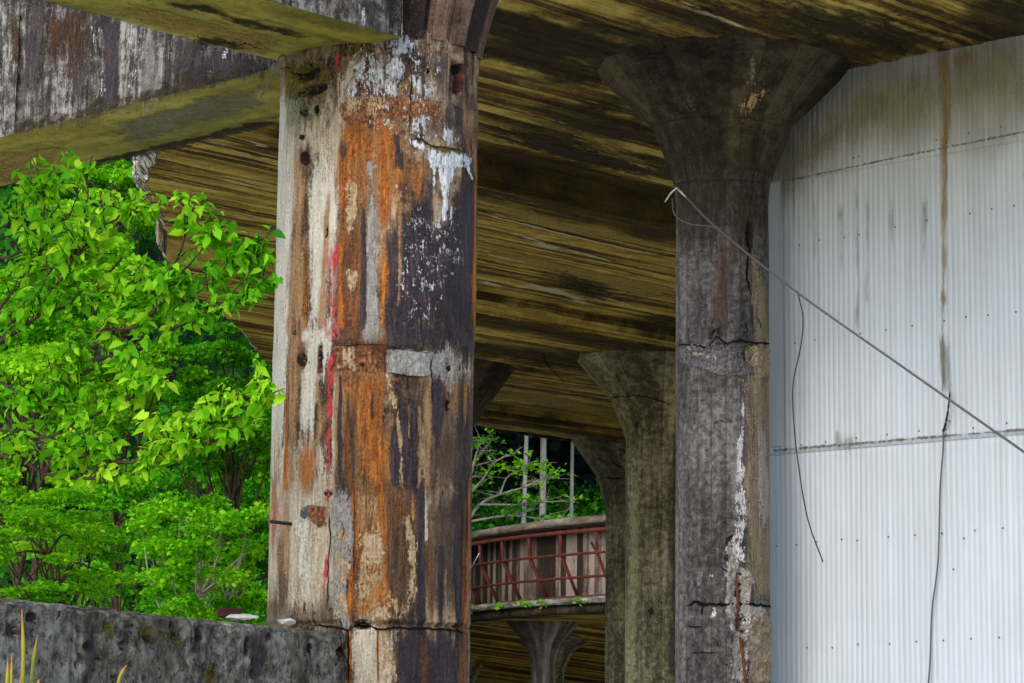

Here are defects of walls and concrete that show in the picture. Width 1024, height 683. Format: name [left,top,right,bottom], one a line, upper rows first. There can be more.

rust [272,119,433,683]
spalling [269,43,471,683]
water stain [316,0,1024,683]
crack [678,219,770,348]
spalling [679,342,771,381]
rust [940,53,969,300]
crack [308,491,466,683]
crack [686,600,771,653]